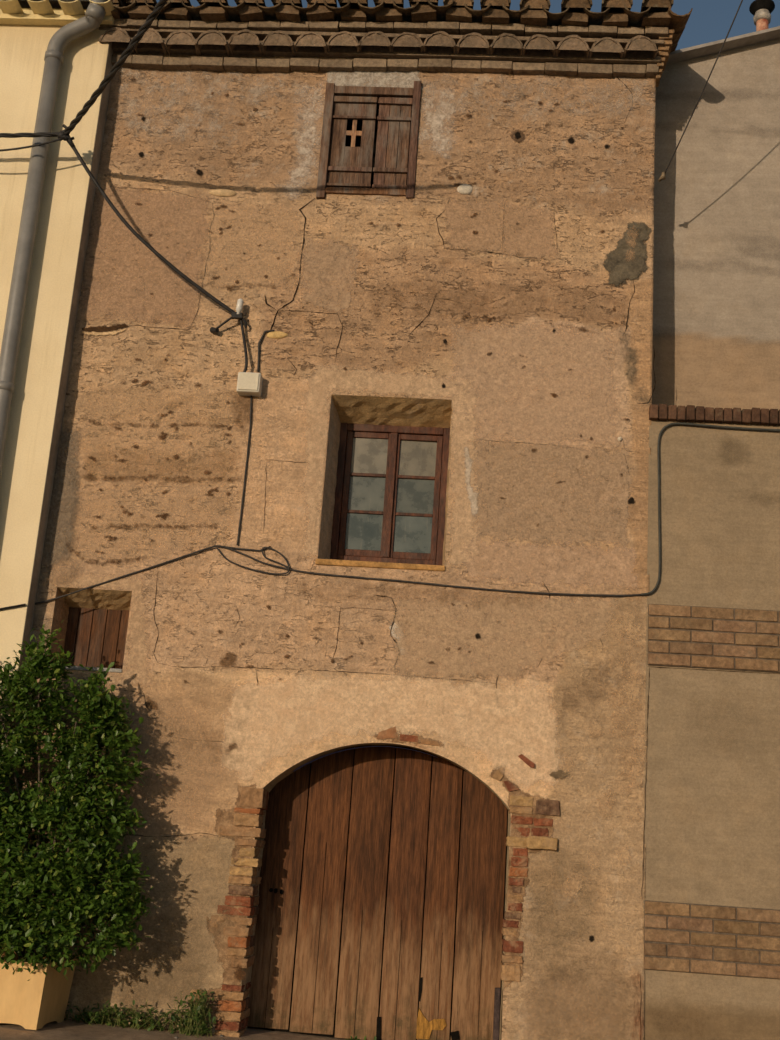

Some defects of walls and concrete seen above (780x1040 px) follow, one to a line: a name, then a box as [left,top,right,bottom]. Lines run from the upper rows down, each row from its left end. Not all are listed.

crack [265,198,357,378]
peeling [190,596,616,1037]